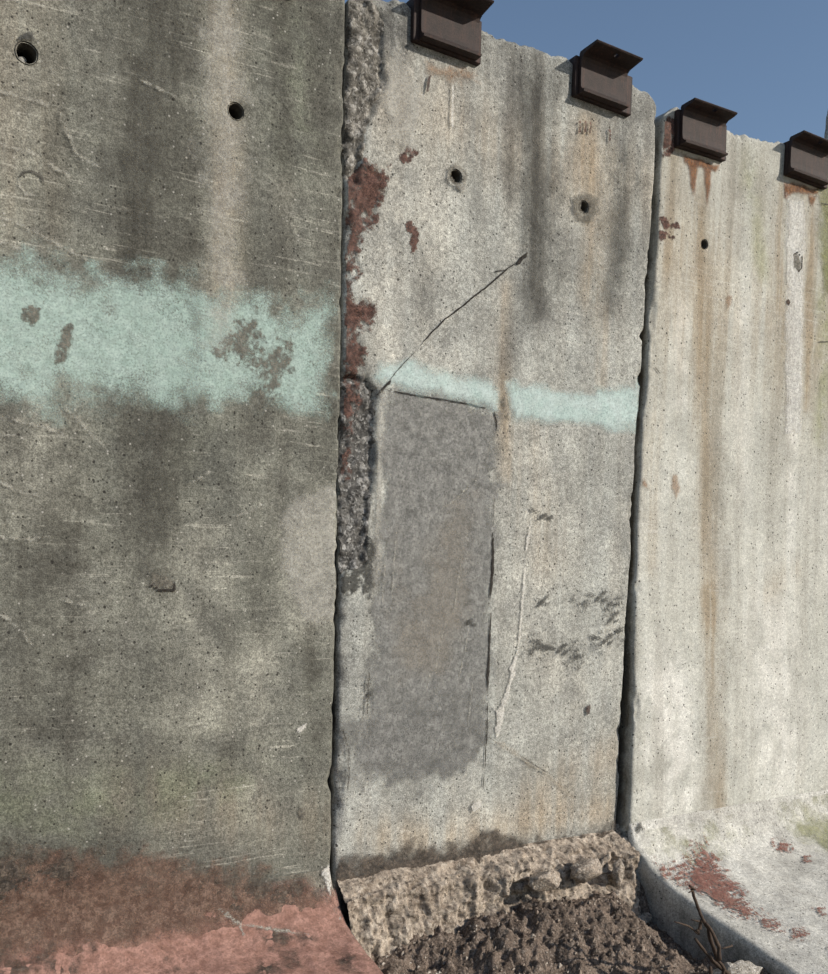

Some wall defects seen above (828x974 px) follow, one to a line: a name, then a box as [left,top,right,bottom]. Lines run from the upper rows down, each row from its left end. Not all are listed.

spalling [341,0,386,183]
corrosion [663,116,675,158]
corrosion [659,216,680,241]
corrosion [685,155,719,199]
corrosion [785,182,818,204]
peeling [213,320,294,408]
corrosion [343,145,419,432]
crack [377,253,528,395]
spalling [337,375,376,575]
damp [341,535,380,600]
crack [483,511,500,788]
corrosion [771,838,812,863]